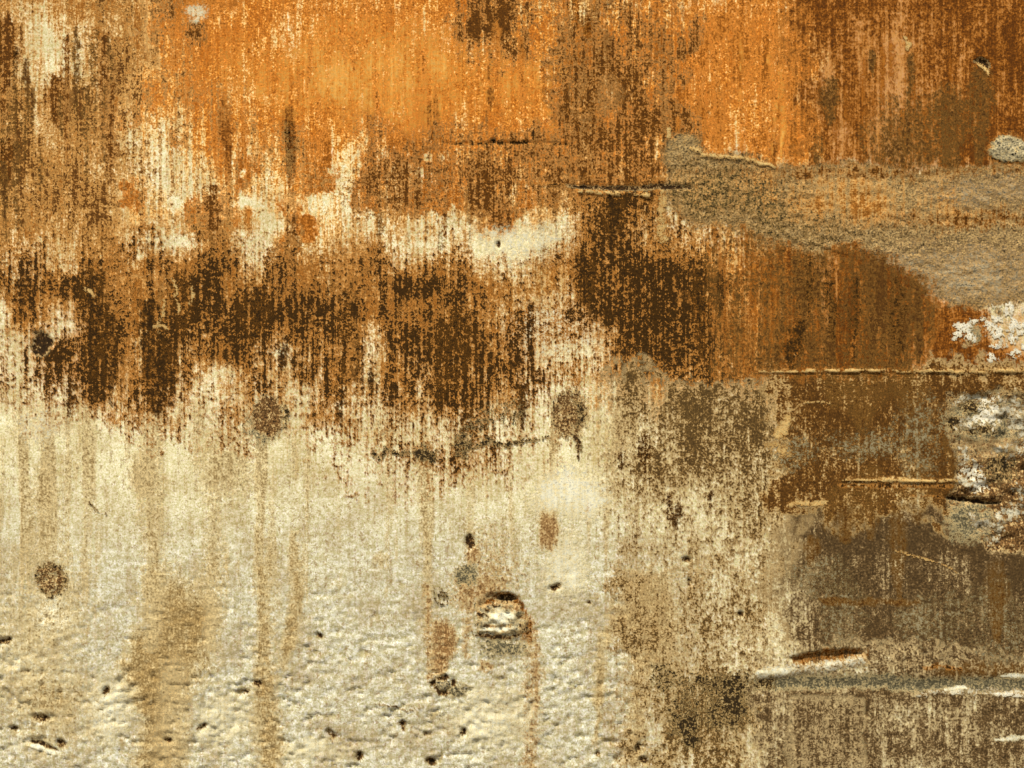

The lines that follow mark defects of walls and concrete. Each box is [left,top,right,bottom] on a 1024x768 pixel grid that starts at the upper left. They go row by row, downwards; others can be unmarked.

corrosion [0,0,1024,432]
flaking render [654,126,1024,363]
crack [911,495,999,506]
crack [755,646,870,679]